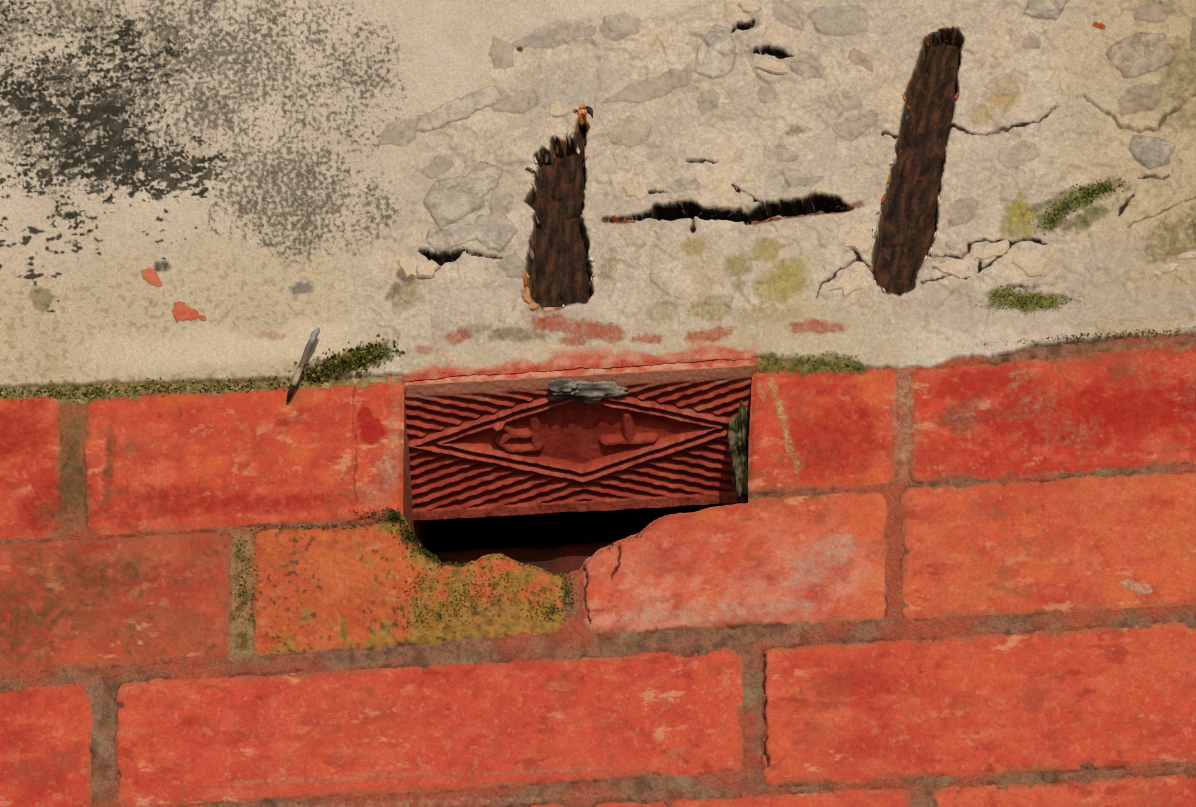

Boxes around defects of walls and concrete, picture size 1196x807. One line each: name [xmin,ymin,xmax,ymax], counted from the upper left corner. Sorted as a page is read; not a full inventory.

leakage [0,0,403,312]
crack [1107,110,1176,133]
spalling [349,0,1196,412]
crack [418,248,502,266]
crack [816,250,876,298]
crack [921,238,1047,291]
spalling [253,515,566,656]
crack [583,552,621,624]
spalling [582,492,888,635]